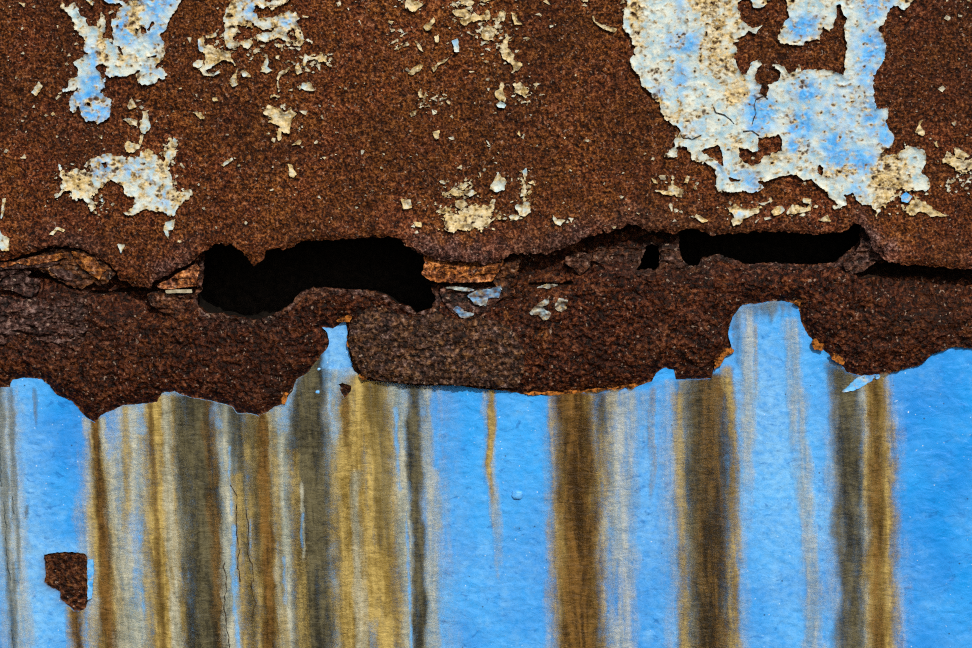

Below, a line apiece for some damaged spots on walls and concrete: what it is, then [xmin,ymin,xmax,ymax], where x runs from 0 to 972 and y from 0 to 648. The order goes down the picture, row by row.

peeling [0,231,10,251]
crack [29,271,198,294]
peeling [60,0,181,139]
peeling [55,98,193,239]
peeling [193,0,327,145]
peeling [438,168,535,233]
peeling [452,0,529,108]
crack [528,280,573,288]
peeling [592,0,947,226]
crack [856,262,972,282]
peeling [934,141,972,174]
corrosion [0,224,972,648]